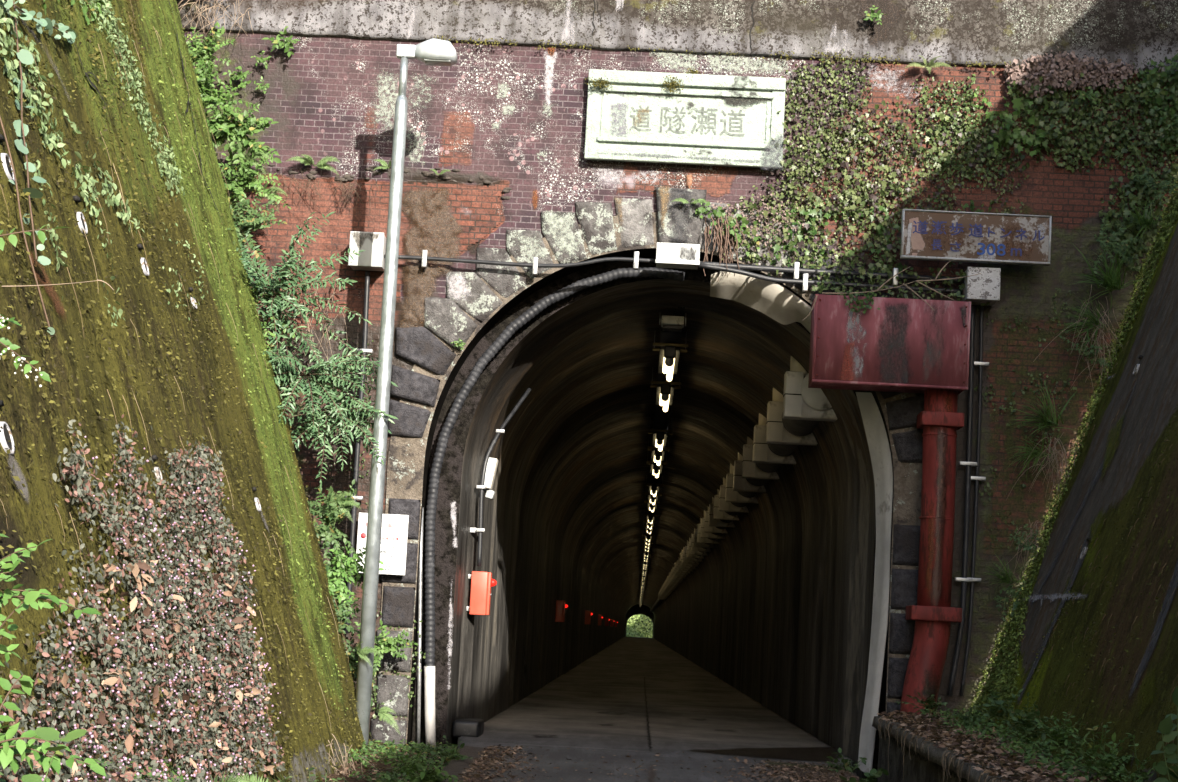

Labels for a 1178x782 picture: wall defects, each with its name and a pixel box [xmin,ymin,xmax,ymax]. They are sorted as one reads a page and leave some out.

rust [932,431,947,607]